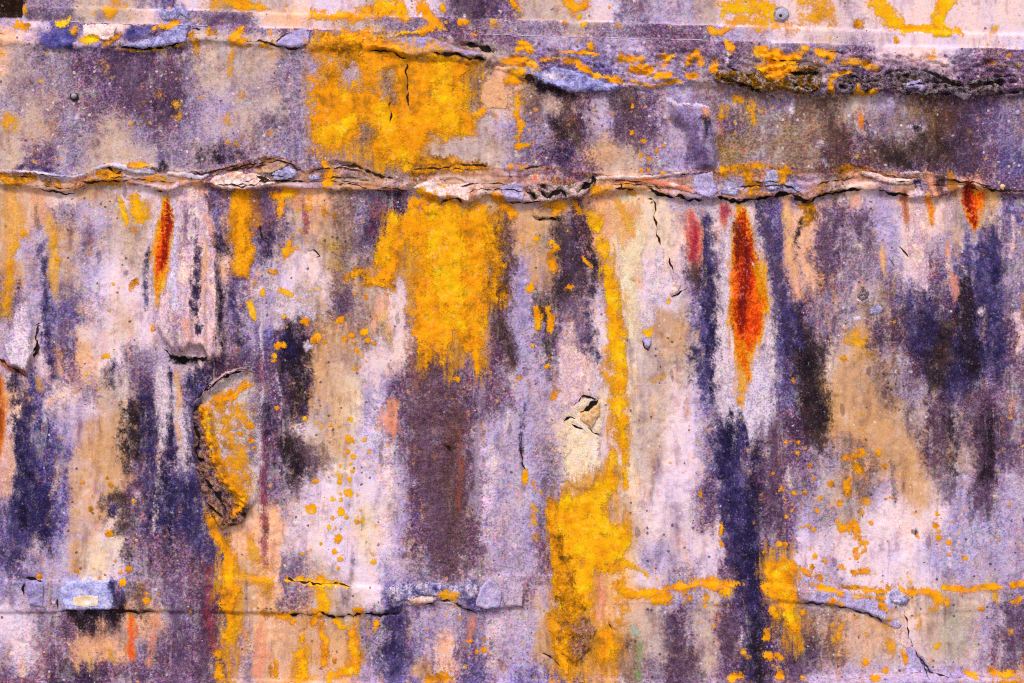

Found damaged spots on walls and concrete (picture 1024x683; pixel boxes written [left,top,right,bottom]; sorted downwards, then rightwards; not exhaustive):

peeling [37,8,192,53]
peeling [526,67,619,103]
water stain [816,91,847,169]
corrosion [150,196,174,310]
crack [8,158,1024,303]
corrosion [719,202,771,407]
water stain [874,95,1024,511]
corrosion [924,170,997,230]
peeling [191,367,265,529]
peeling [558,397,604,489]
water stain [685,202,835,683]
crack [804,602,949,678]